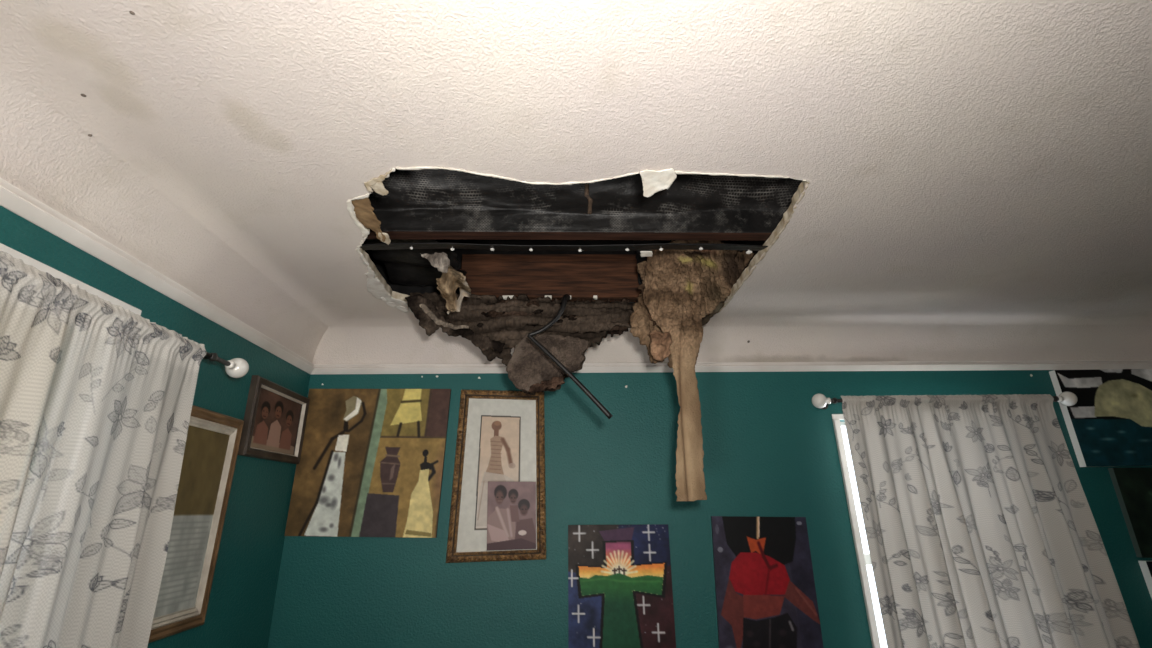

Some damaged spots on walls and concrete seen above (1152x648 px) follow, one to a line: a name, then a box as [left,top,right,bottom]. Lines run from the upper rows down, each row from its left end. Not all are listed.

peeling [364,170,392,196]
flaking render [640,168,677,197]
peeling [346,201,369,237]
peeling [360,254,414,314]